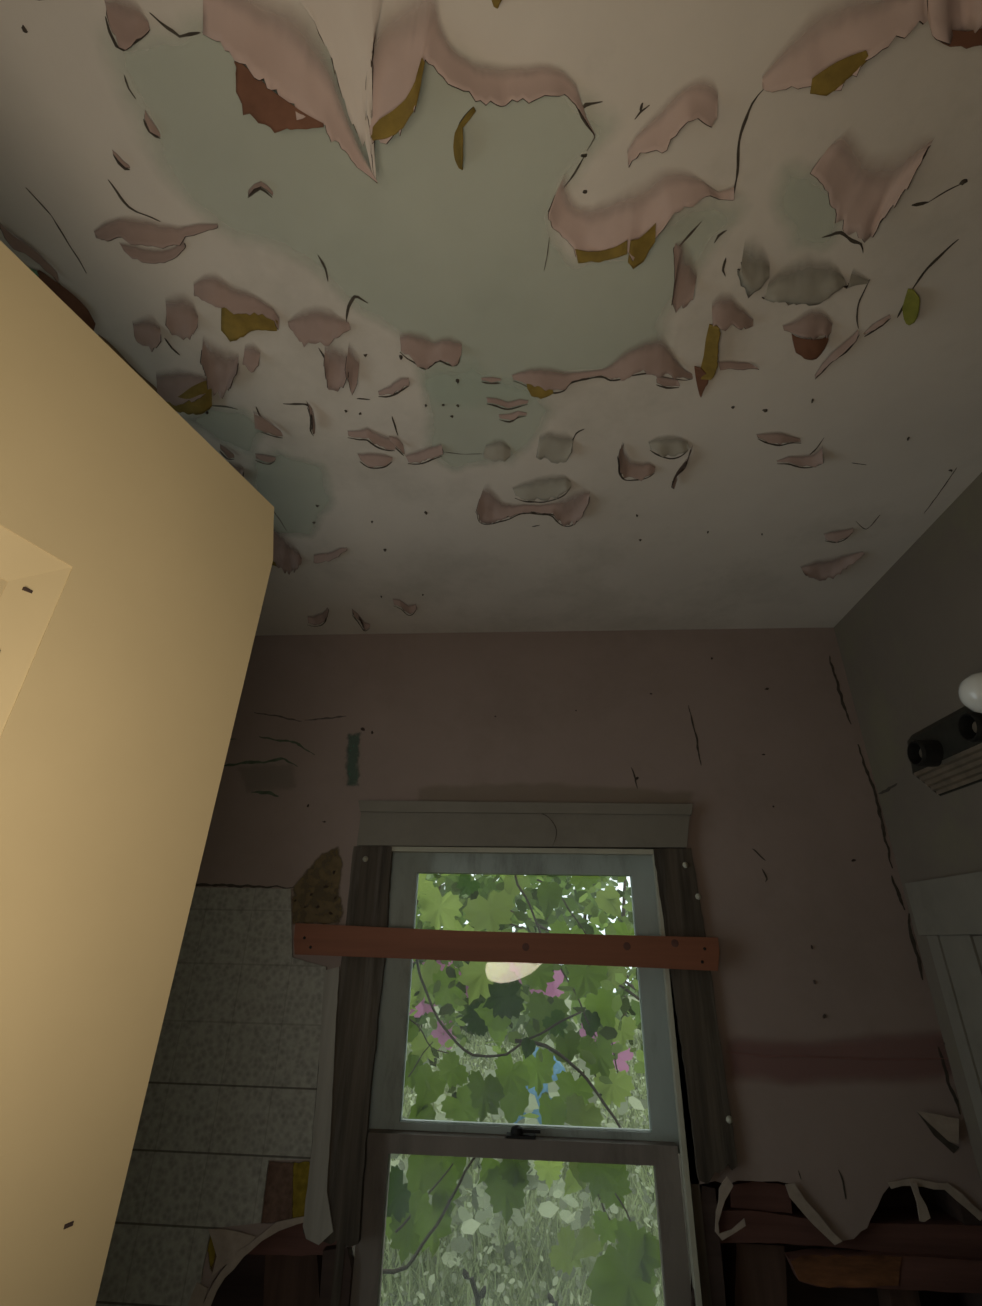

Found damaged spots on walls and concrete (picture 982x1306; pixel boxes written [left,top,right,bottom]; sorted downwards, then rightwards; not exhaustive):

peeling [94,0,982,269]
peeling [671,222,701,312]
peeling [0,223,511,469]
peeling [476,429,590,527]
peeling [617,438,692,489]
peeling [272,511,347,575]
crack [829,656,923,980]
crack [938,1047,961,1115]
spalling [715,1176,746,1241]
spalling [785,1183,842,1245]
spalling [888,1178,982,1222]
spalling [188,1216,304,1306]